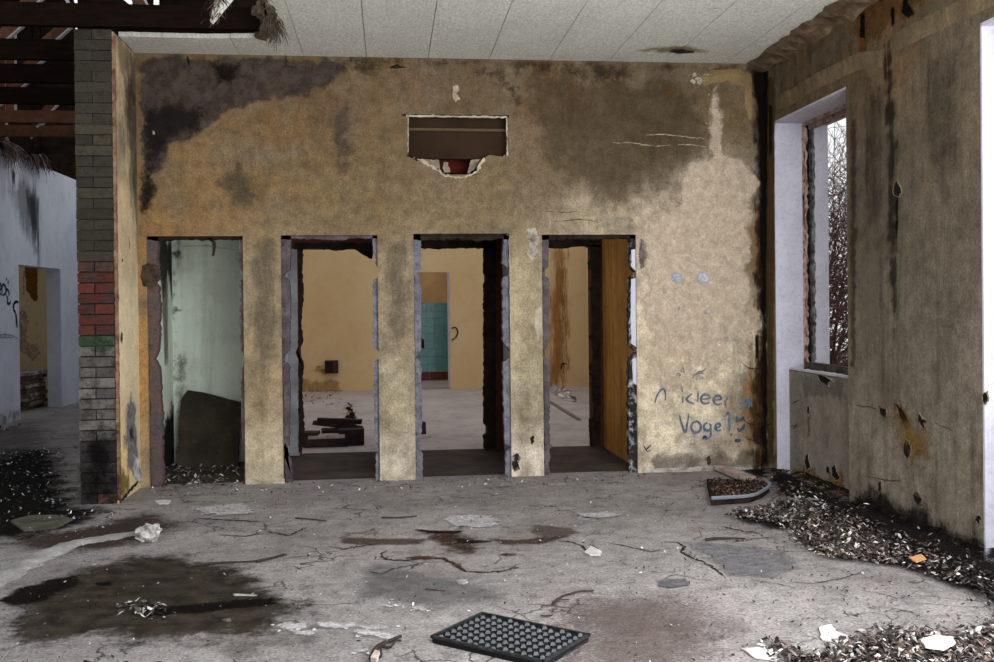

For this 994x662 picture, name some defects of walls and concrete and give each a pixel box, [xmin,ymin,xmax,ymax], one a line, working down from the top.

spalling [452,84,461,103]
water stain [130,54,374,209]
spalling [402,115,509,179]
crack [613,134,706,147]
water stain [27,190,39,245]
water stain [884,44,900,399]
spalling [140,263,161,288]
water stain [727,67,777,469]
water stain [159,241,185,470]
water stain [737,513,796,529]
water stain [922,571,994,599]